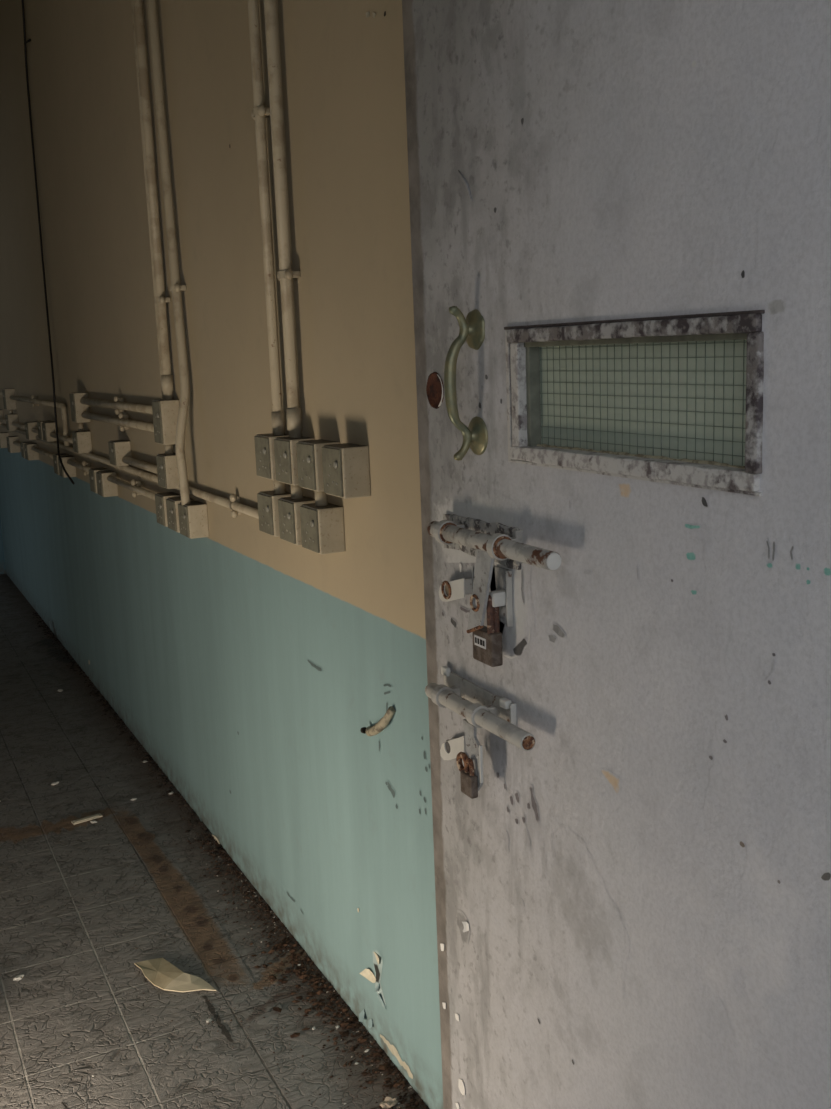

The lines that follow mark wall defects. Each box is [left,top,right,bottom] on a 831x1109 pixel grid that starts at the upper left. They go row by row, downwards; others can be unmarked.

rust [456,752,468,771]
peeling [359,945,387,1013]
peeling [359,1009,413,1080]